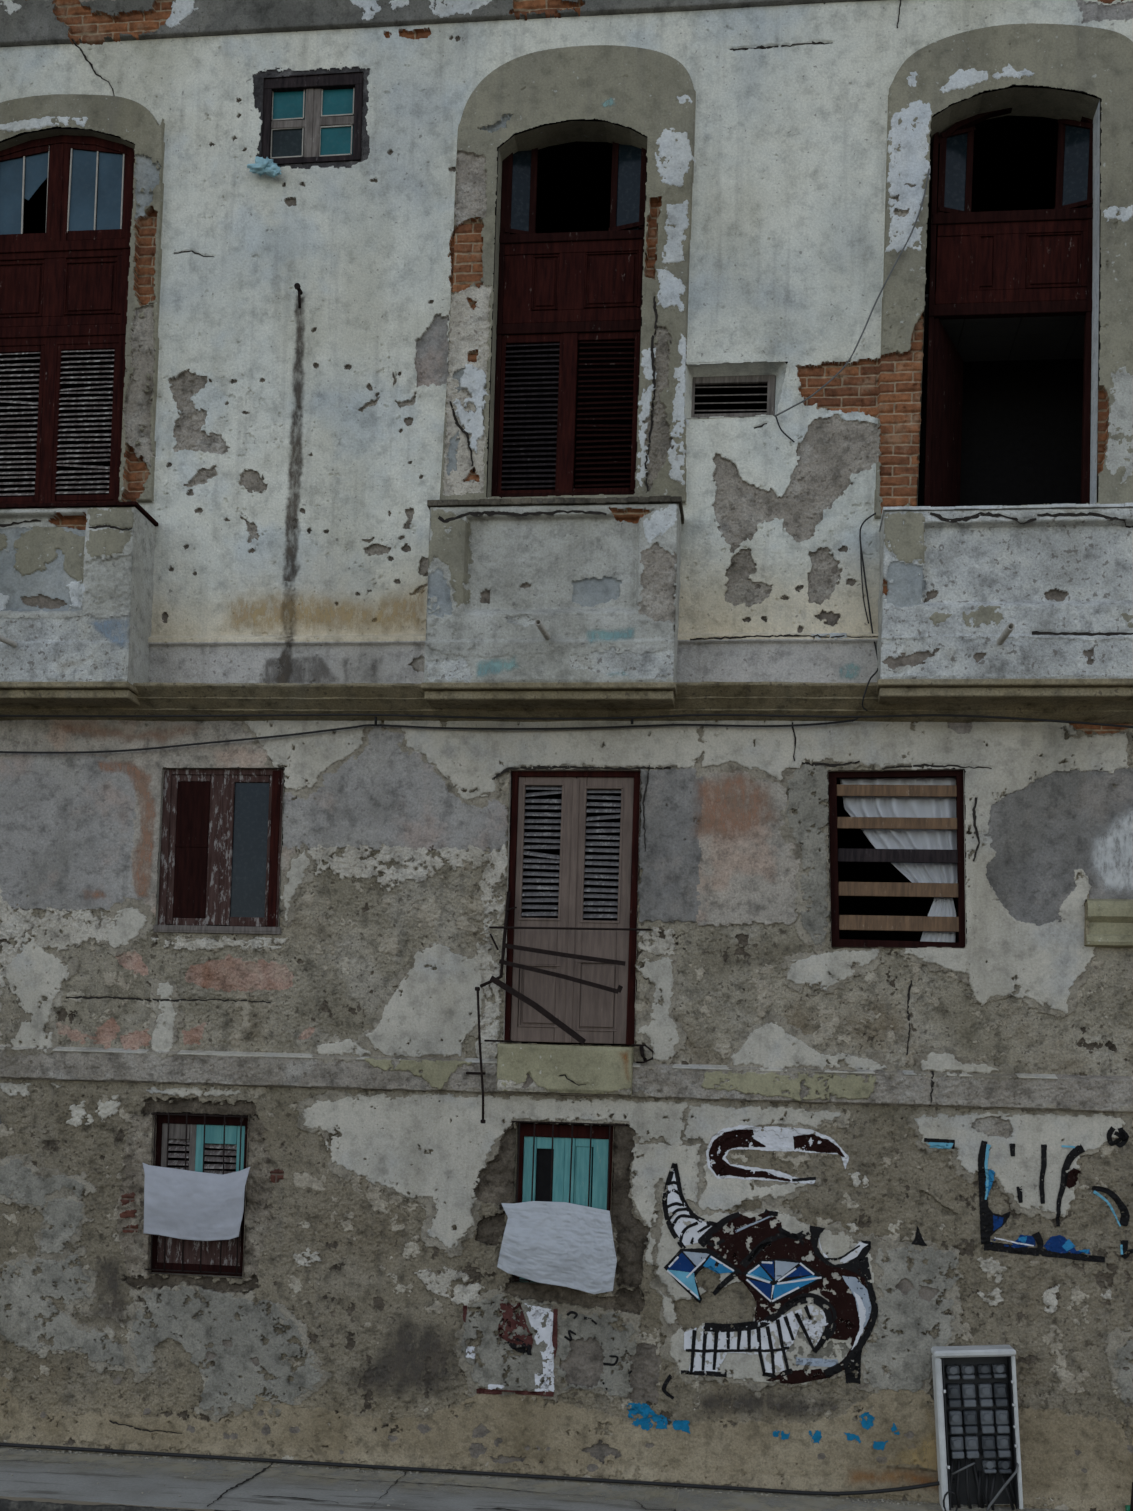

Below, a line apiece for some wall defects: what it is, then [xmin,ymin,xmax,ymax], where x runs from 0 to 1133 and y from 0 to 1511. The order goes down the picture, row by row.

crack [71,38,115,96]
flaking render [52,0,199,45]
flaking render [0,369,230,682]
flaking render [133,206,158,306]
leakage [263,640,334,683]
leakage [234,297,420,625]
flaking render [358,150,678,682]
flaking render [636,128,696,491]
flaking render [712,312,927,622]
flaking render [880,589,1133,679]
peeling [240,720,1133,1019]
peeling [907,1104,1133,1220]